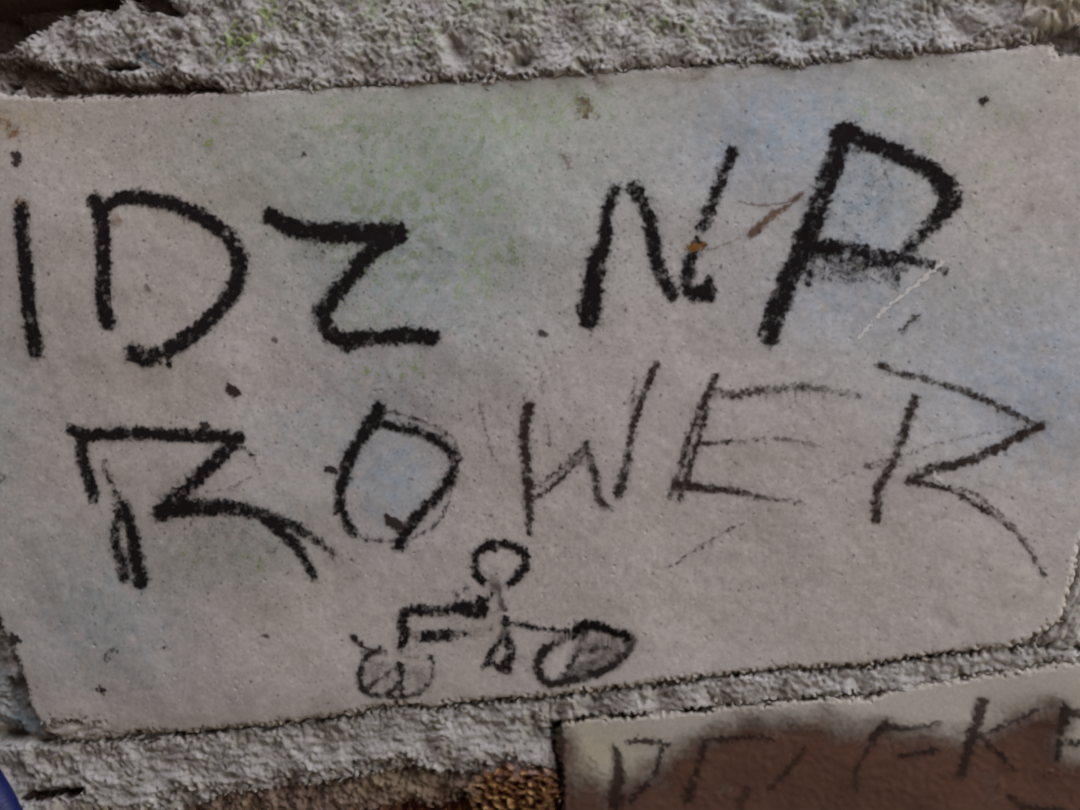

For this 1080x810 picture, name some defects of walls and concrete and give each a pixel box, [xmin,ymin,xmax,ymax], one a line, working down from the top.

spalling [0,0,226,102]
corrosion [739,192,804,238]
corrosion [684,242,706,252]